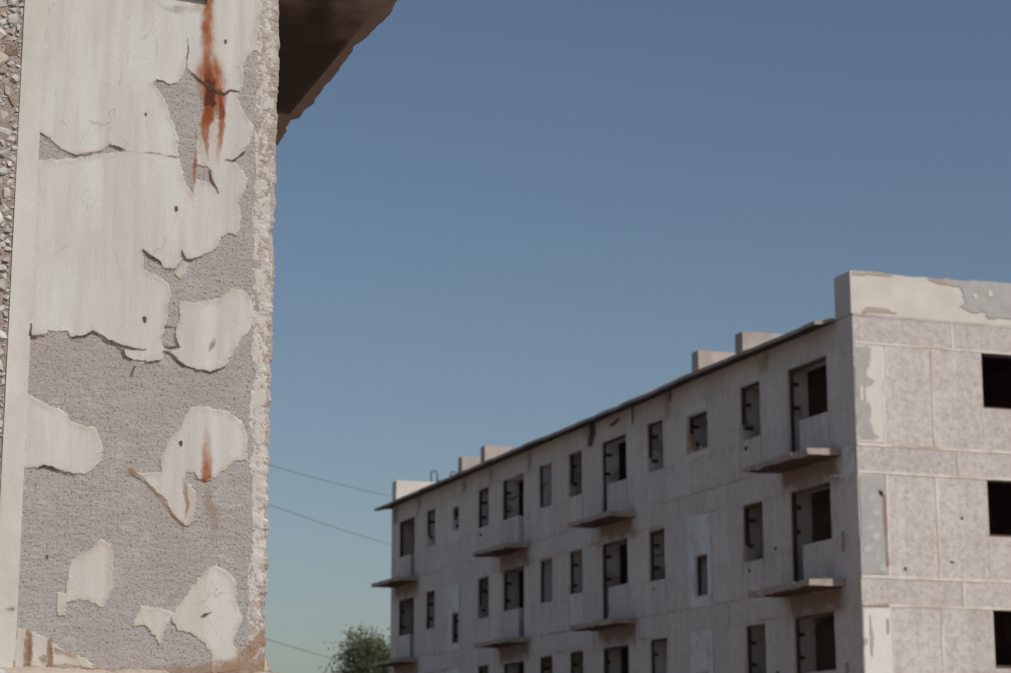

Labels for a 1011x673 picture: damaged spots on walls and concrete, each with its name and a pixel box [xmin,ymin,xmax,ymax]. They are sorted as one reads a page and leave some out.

rust [198,0,225,147]
damp [276,0,359,115]
flaking render [15,0,280,673]
flaking render [853,345,879,440]
flaking render [928,278,1011,319]
rust [202,460,212,482]